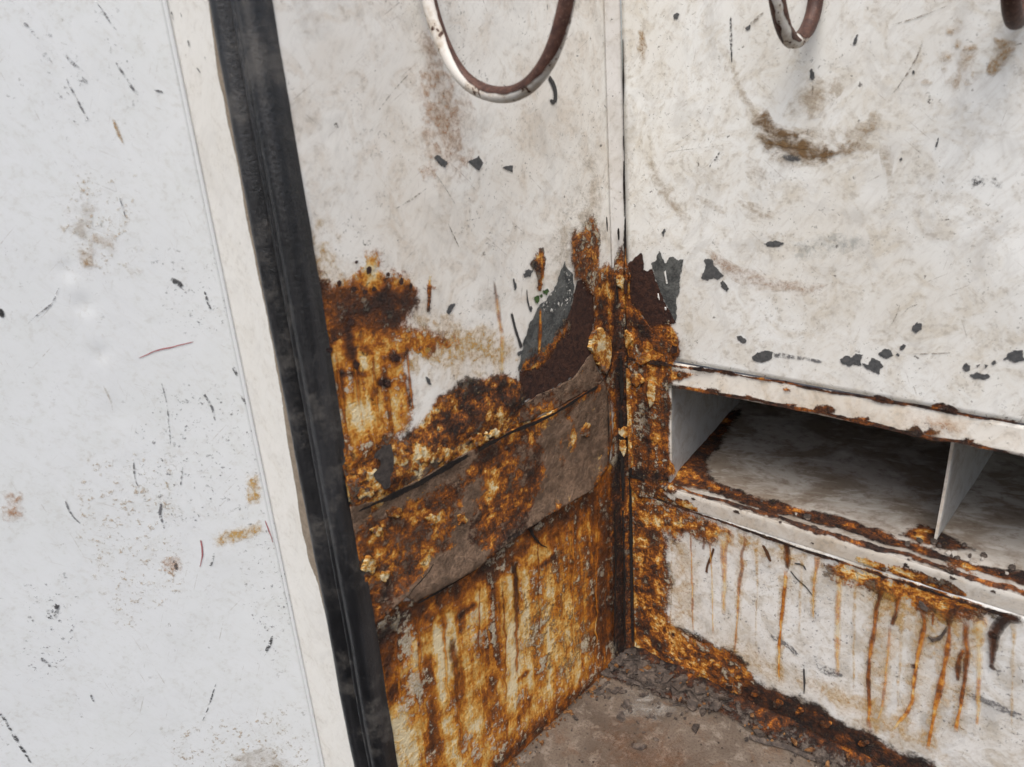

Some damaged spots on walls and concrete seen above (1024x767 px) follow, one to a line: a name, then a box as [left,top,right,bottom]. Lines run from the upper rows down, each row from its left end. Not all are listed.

corrosion [318,252,537,520]
corrosion [376,215,1024,767]